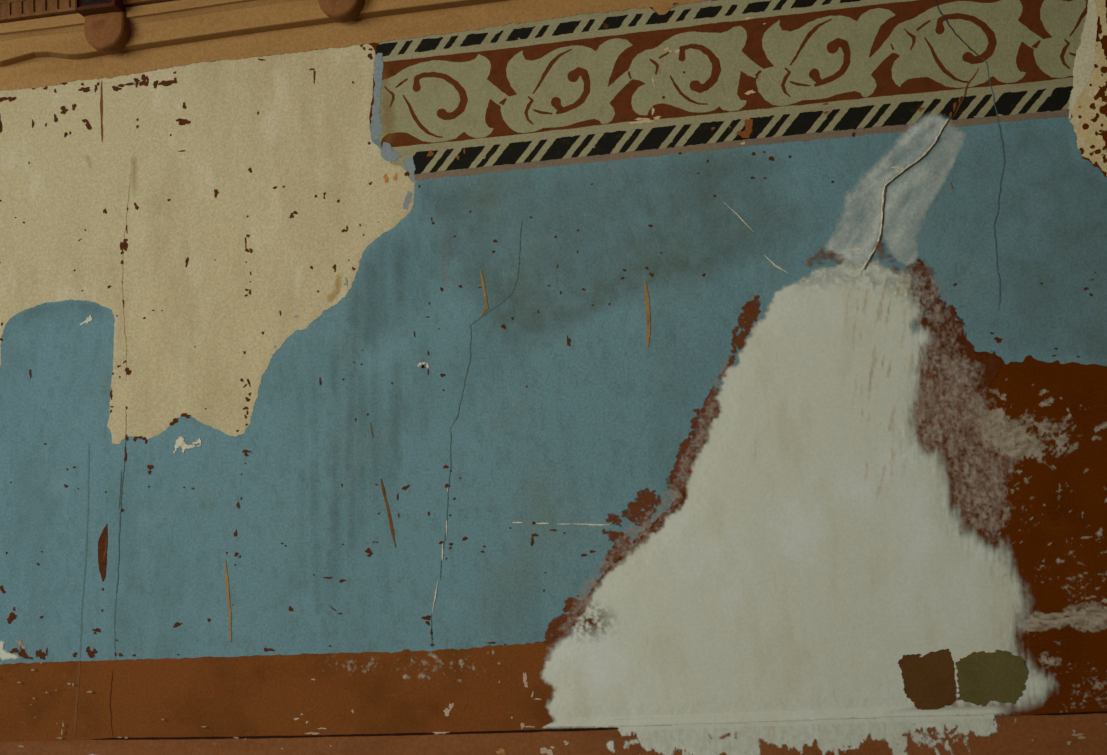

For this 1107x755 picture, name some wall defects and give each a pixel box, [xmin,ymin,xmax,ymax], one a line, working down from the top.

peeling [0,44,420,461]
peeling [736,119,774,161]
crack [848,0,1005,308]
peeling [1068,0,1107,176]